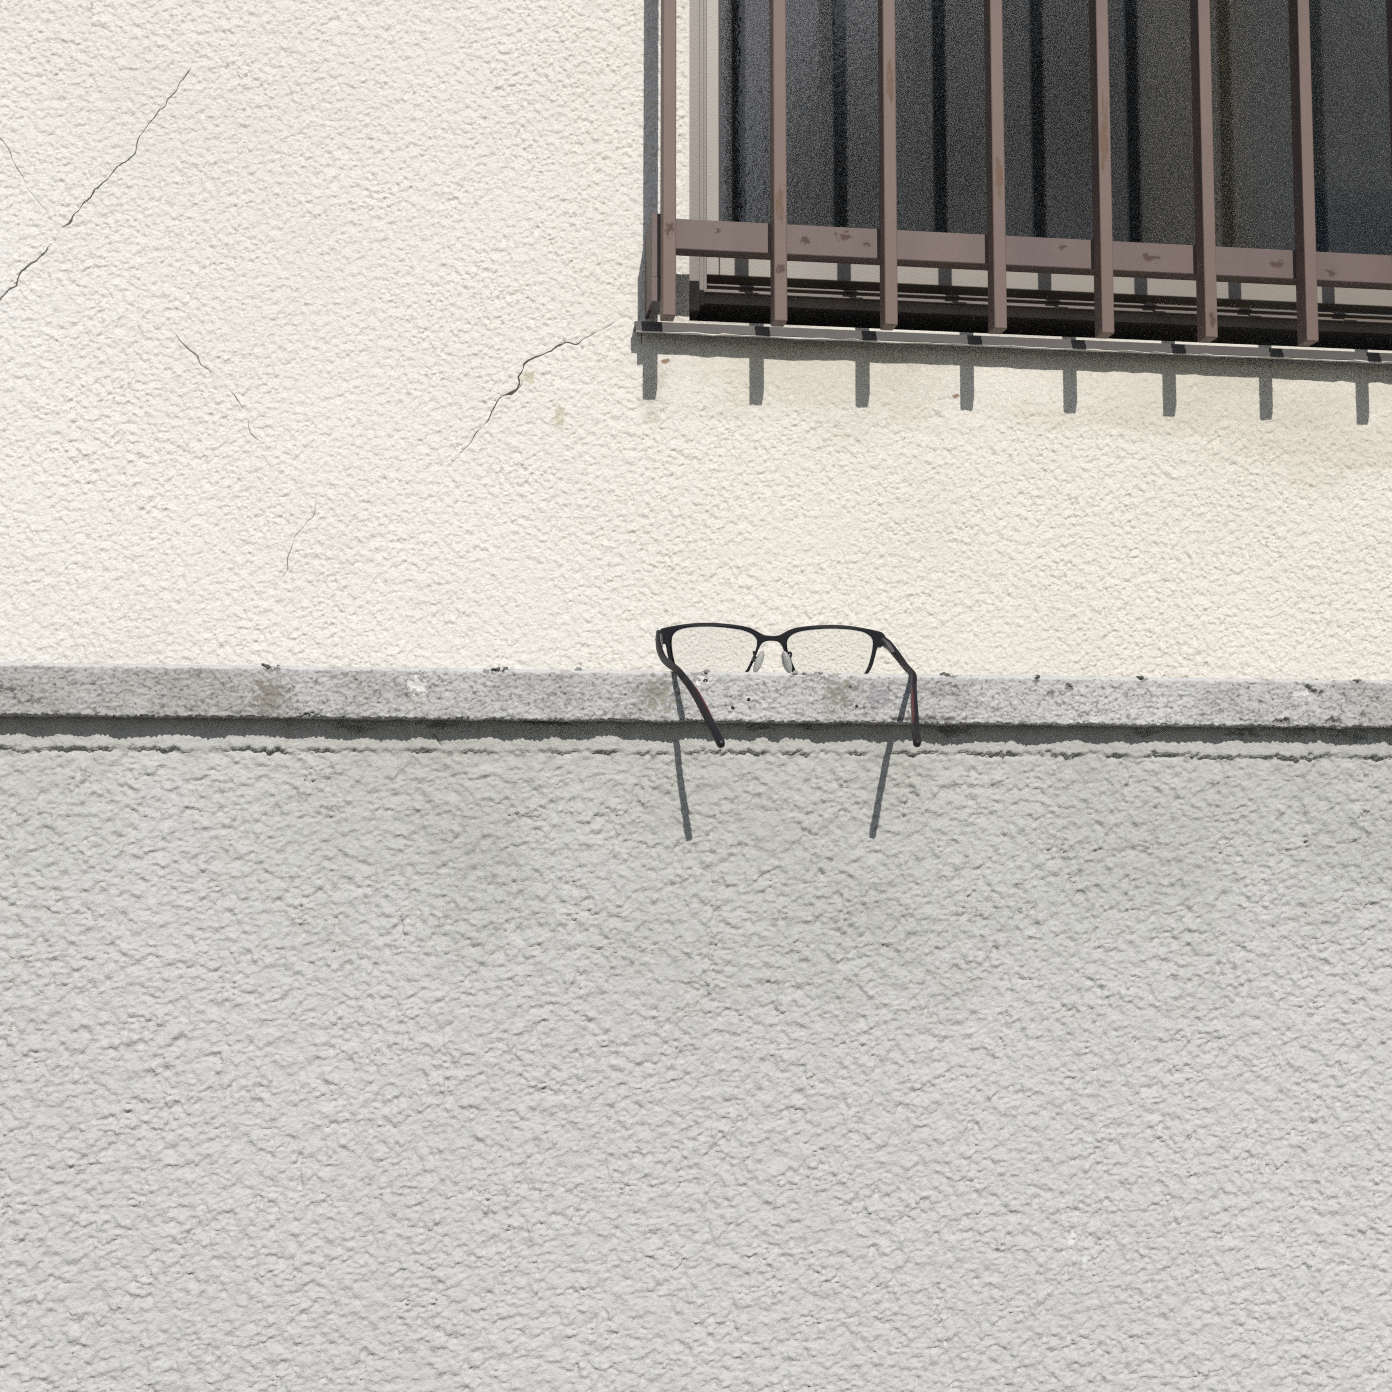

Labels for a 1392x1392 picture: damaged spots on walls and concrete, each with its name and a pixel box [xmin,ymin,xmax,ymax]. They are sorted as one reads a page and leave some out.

crack [0,42,199,300]
crack [456,322,642,459]